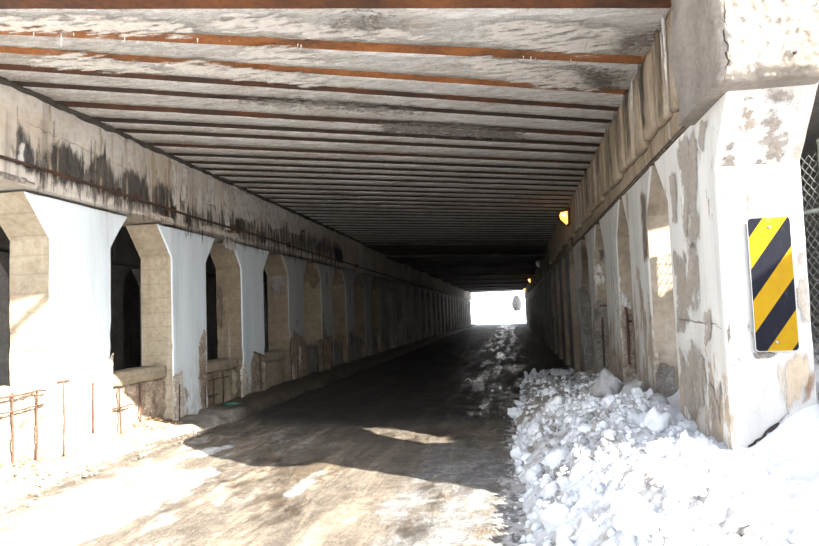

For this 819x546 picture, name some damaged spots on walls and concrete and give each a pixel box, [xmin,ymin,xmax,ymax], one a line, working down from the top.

water stain [0,13,529,141]
crack [722,2,730,78]
peeling [721,143,735,167]
peeling [756,90,812,165]
water stain [13,126,343,265]
peeling [669,120,707,332]
peeling [747,191,782,218]
peeling [796,278,810,322]
peeling [654,310,721,422]